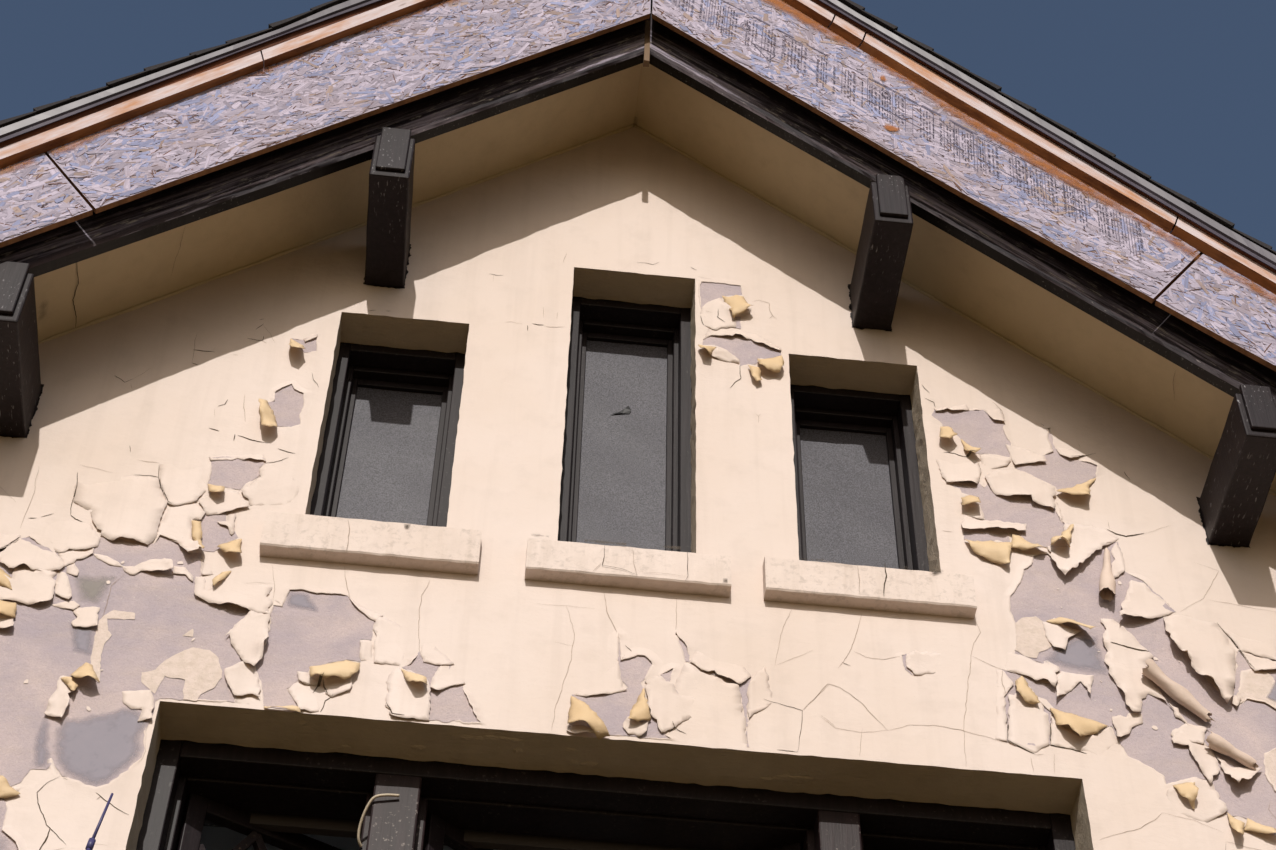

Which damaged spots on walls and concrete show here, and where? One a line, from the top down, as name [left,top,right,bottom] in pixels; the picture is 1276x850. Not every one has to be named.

peeling [258,380,313,432]
peeling [695,277,784,381]
peeling [0,454,488,850]
crack [301,673,331,712]
crack [546,548,688,725]
peeling [566,626,773,747]
crack [765,561,1087,771]
peeling [929,404,1276,850]